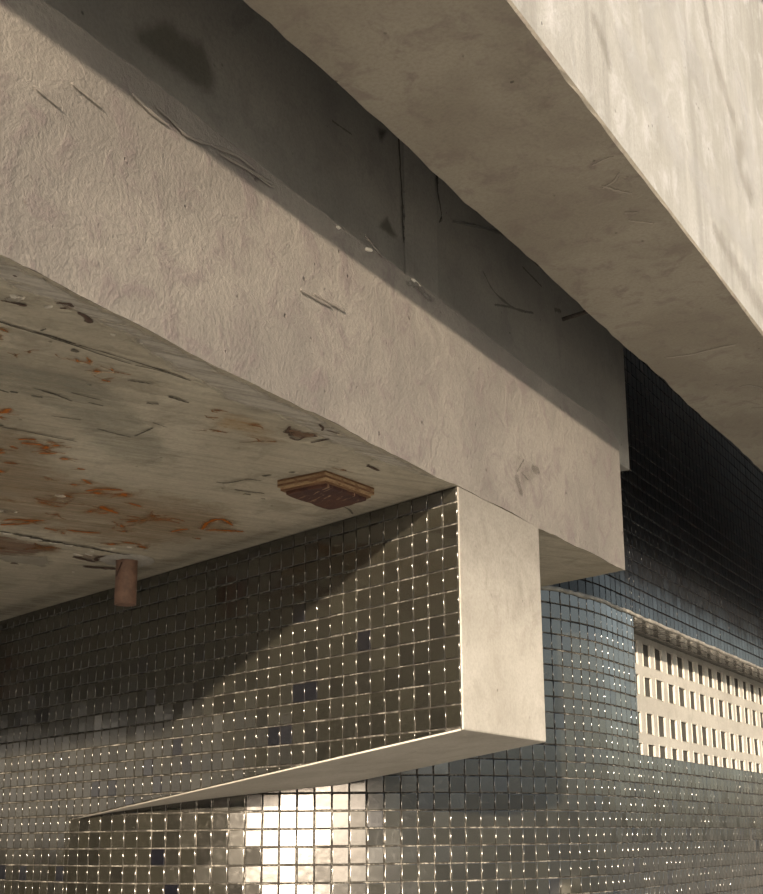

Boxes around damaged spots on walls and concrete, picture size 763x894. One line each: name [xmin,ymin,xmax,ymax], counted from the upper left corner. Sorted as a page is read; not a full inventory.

crack [397,138,405,243]
crack [436,175,508,239]
crack [0,321,190,442]
corrosion [0,439,188,549]